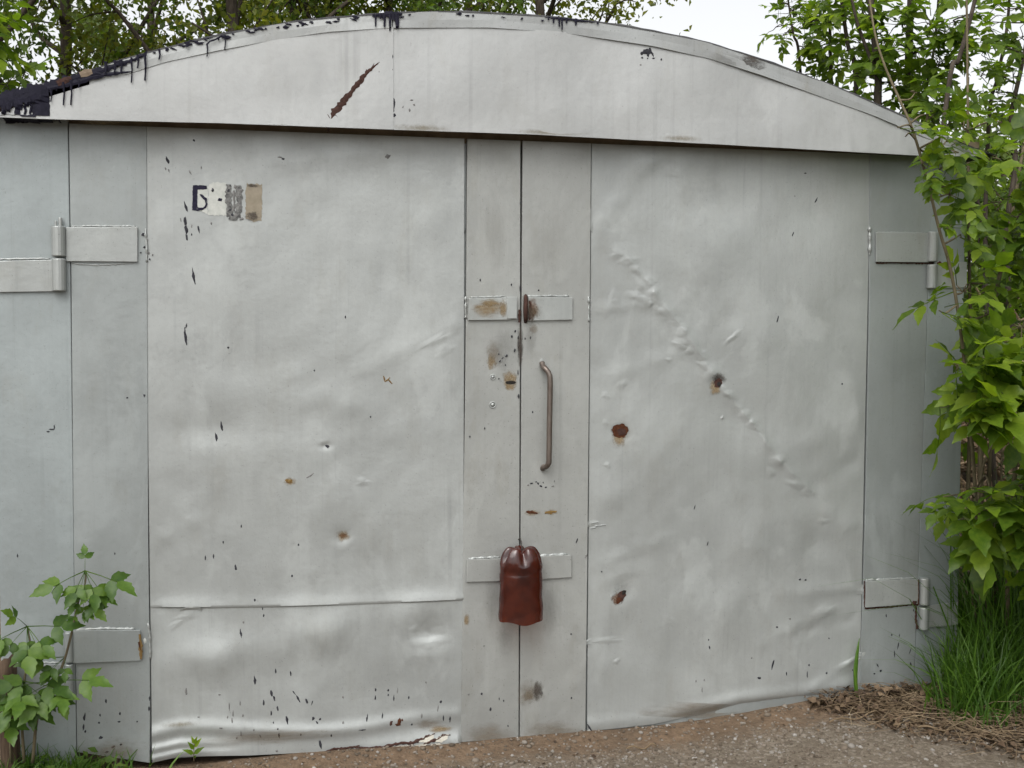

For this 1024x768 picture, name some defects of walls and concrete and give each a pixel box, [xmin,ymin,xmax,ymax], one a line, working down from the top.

corrosion [476,301,537,363]